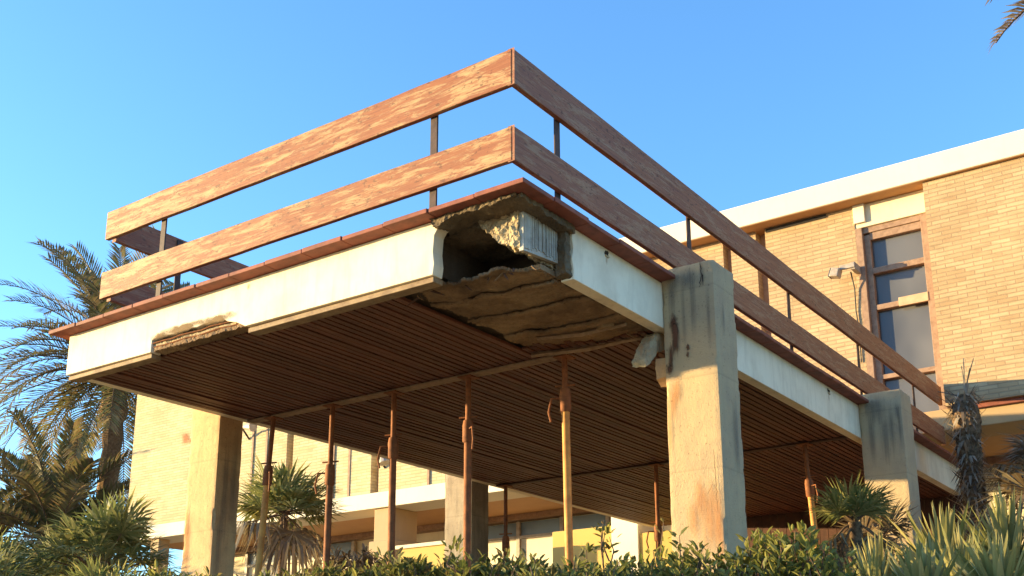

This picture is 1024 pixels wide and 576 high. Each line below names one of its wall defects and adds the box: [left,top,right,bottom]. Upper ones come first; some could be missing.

spalling [406,192,654,358]
spalling [152,321,250,355]
corrosion [666,315,689,374]